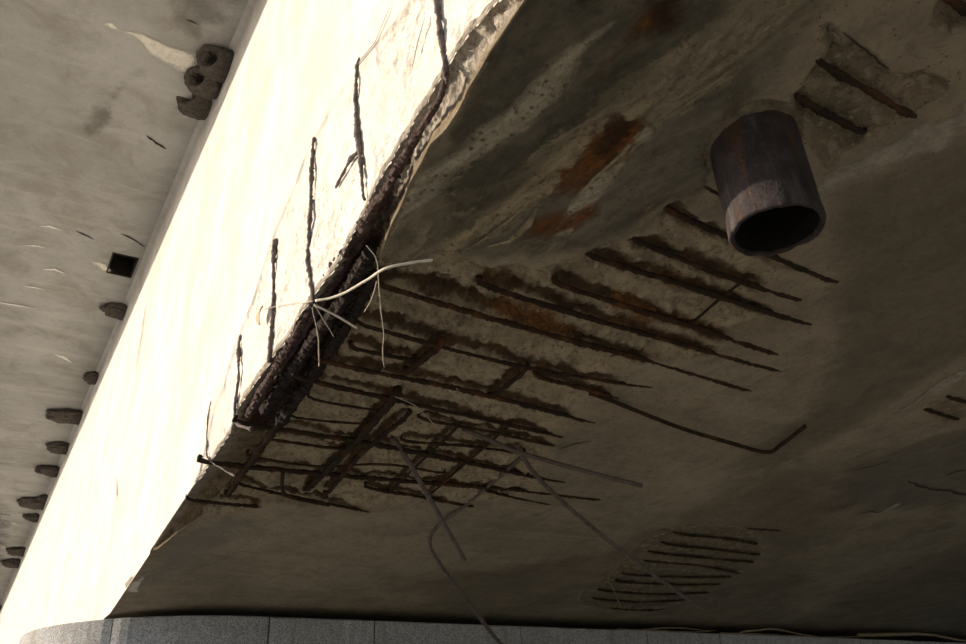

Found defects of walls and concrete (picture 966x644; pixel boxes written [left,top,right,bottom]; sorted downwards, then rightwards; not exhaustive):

damp [388,0,778,257]
rust [558,116,642,191]
rust [530,206,596,236]
spalling [148,0,966,559]
crack [908,470,966,496]
spalling [573,522,773,614]